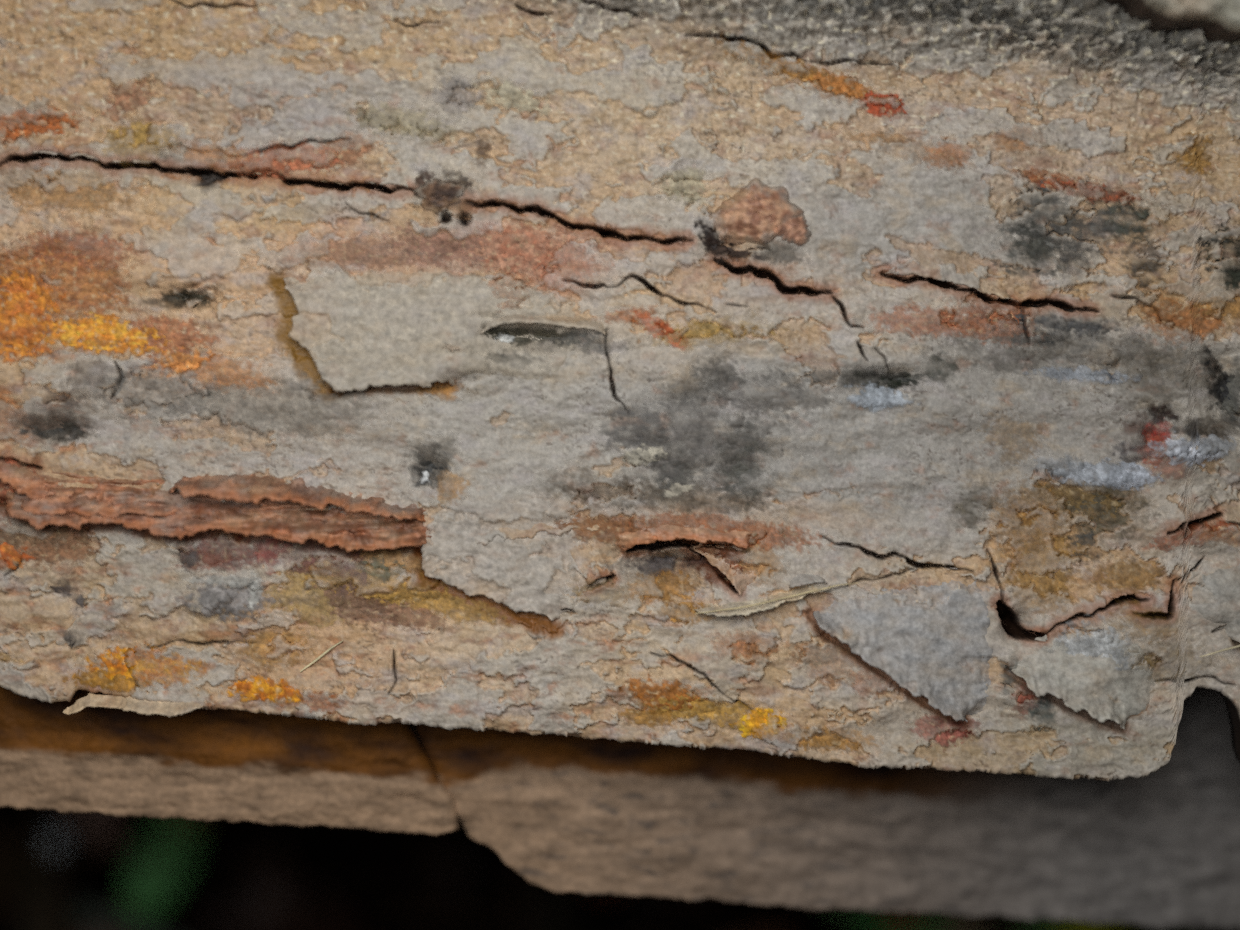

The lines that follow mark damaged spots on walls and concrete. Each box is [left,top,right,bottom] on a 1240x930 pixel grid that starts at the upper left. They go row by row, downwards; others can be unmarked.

crack [0,138,414,219]
rust [0,231,227,390]
crack [467,200,887,366]
crack [881,273,1164,344]
damp [995,181,1163,288]
damp [571,355,958,513]
rust [0,458,993,747]
crack [589,538,747,593]
crack [820,535,1202,640]
rust [998,481,1125,598]
rust [1009,630,1160,730]
rust [799,727,861,751]